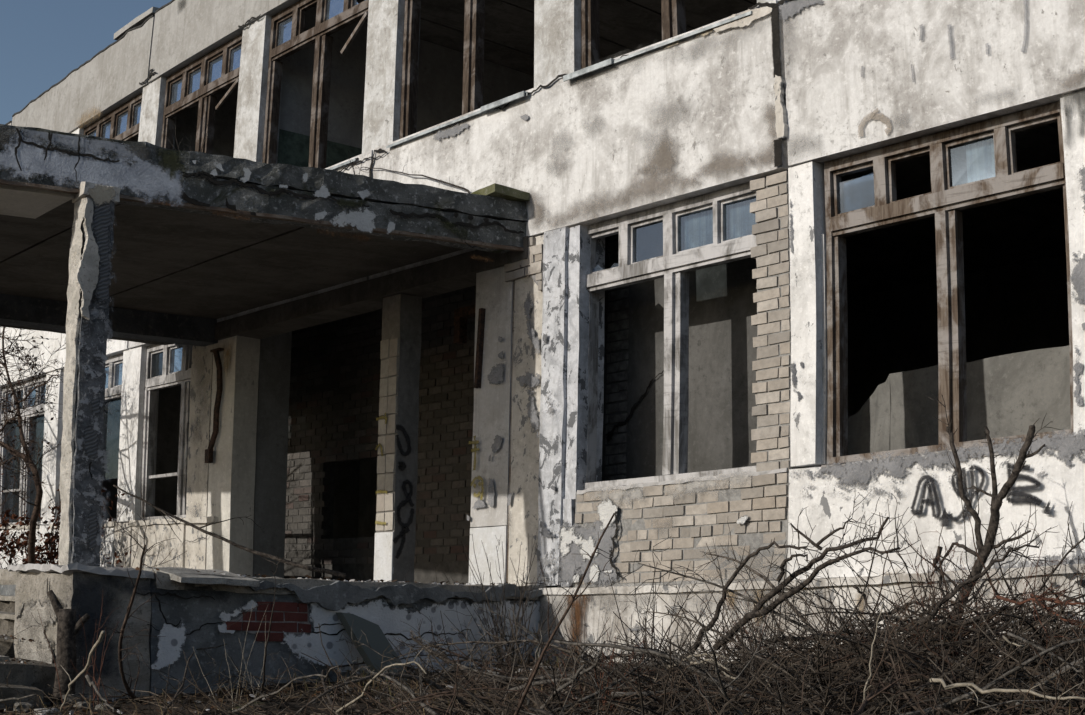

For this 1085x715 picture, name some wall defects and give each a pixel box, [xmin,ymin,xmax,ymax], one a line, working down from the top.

crack [15,128,120,184]
leakage [532,107,776,225]
peeling [313,185,395,234]
peeling [1070,251,1085,305]
peeling [0,129,210,564]
peeling [488,336,554,438]
peeling [524,299,547,353]
peeling [1073,345,1083,406]
peeling [794,423,1085,501]
peeling [218,497,624,675]
peeling [151,623,186,670]